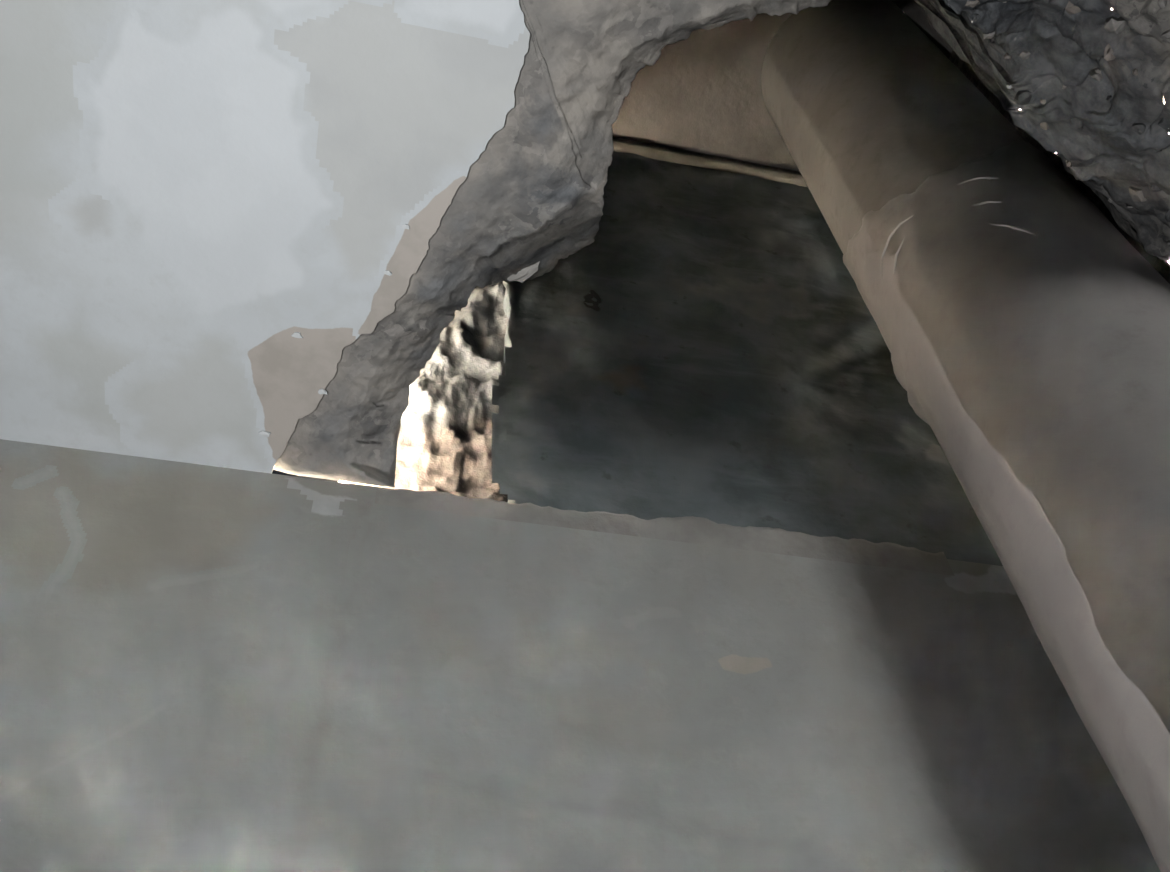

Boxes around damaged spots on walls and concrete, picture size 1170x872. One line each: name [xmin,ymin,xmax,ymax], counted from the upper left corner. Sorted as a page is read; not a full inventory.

leakage [0,0,274,474]
leakage [274,0,530,295]
spalling [242,0,832,503]
leakage [492,288,613,510]
spalling [914,0,1170,284]